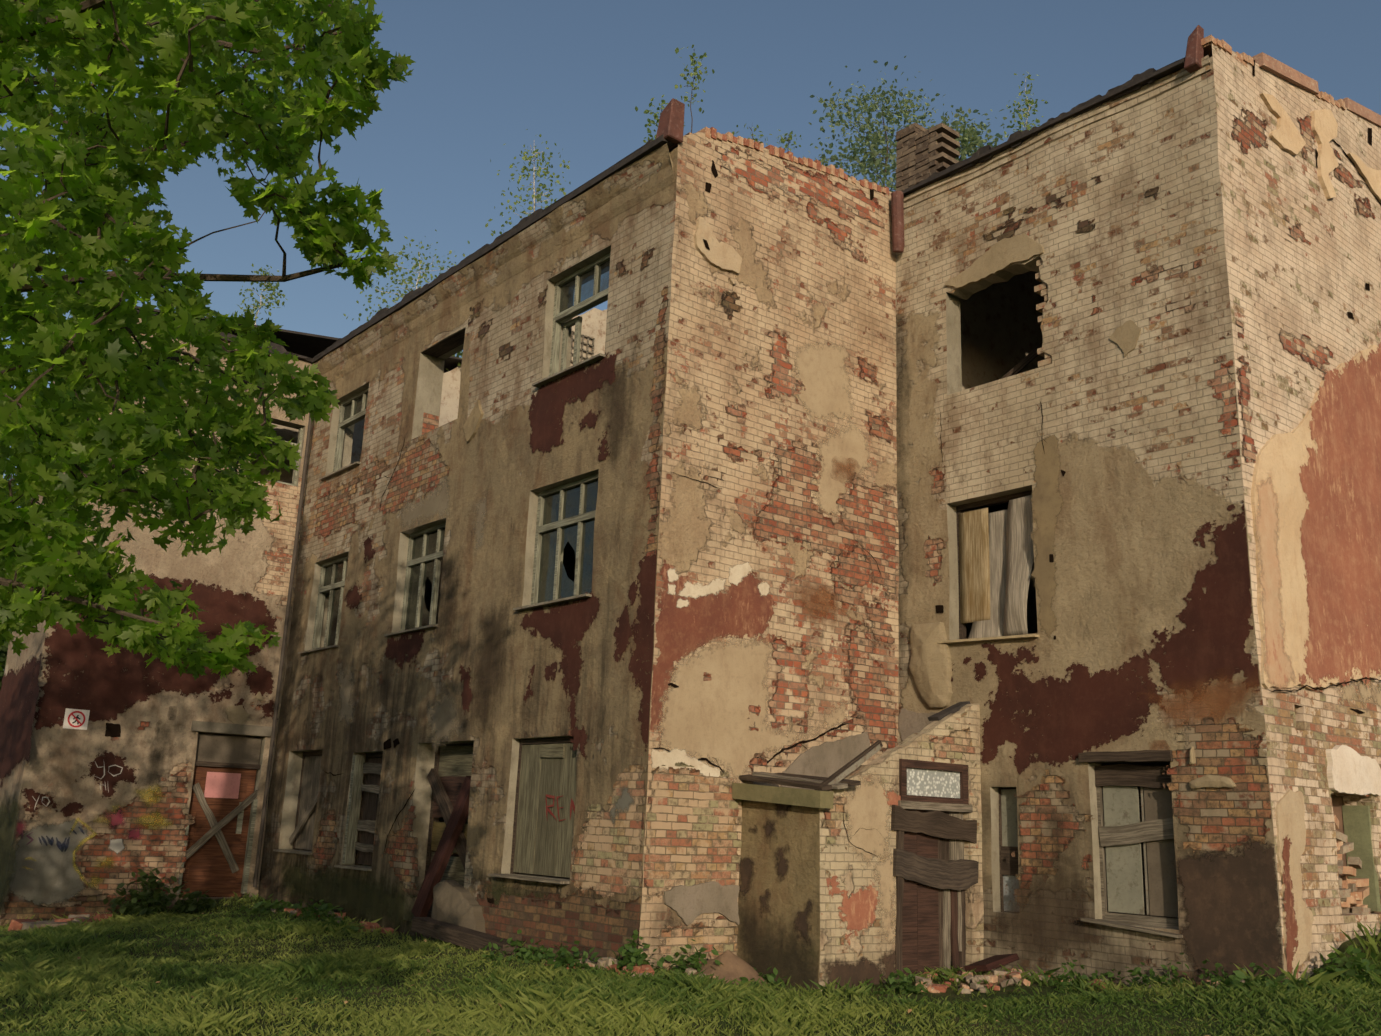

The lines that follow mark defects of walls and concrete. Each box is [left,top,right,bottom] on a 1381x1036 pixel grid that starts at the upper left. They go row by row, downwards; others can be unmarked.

peeling [694,217,742,320]
spalling [705,145,884,263]
spalling [1285,214,1311,245]
spalling [313,437,452,563]
peeling [0,573,279,927]
peeling [476,284,901,989]
crack [654,747,727,778]
crack [757,717,858,771]
peeling [929,320,1381,914]
crack [1269,677,1381,694]
water stain [739,910,818,990]
water stain [1176,840,1283,983]